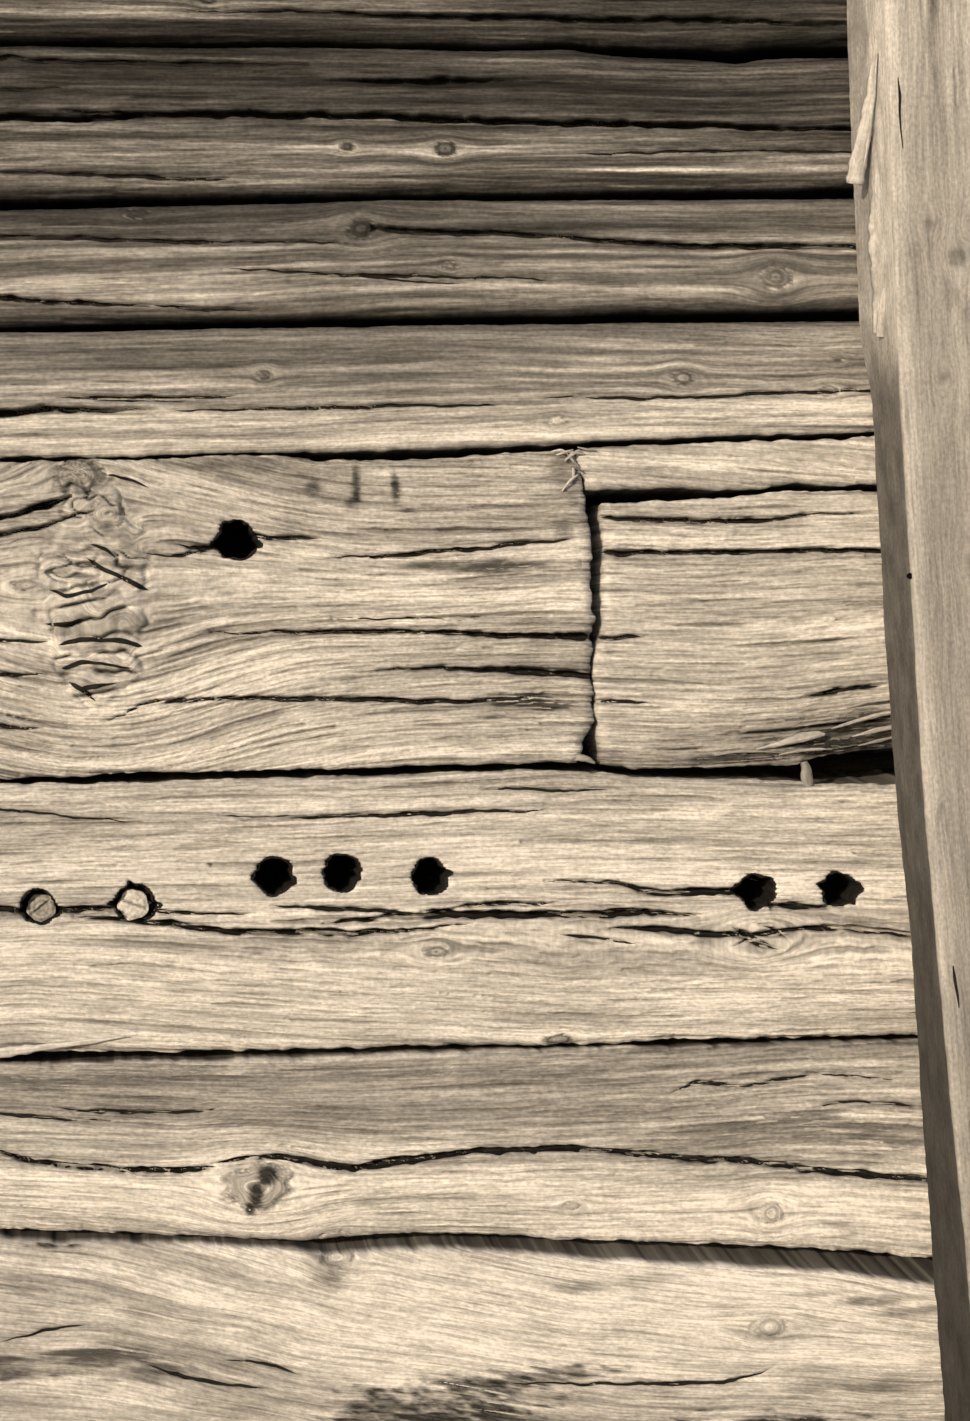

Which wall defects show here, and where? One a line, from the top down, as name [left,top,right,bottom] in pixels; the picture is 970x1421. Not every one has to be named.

crack [108,474,149,488]
crack [600,512,881,557]
crack [0,497,648,720]
crack [811,685,882,696]
crack [0,723,40,731]
crack [0,879,910,949]
crack [671,1072,910,1107]
crack [0,1107,215,1121]
crack [0,1144,927,1182]